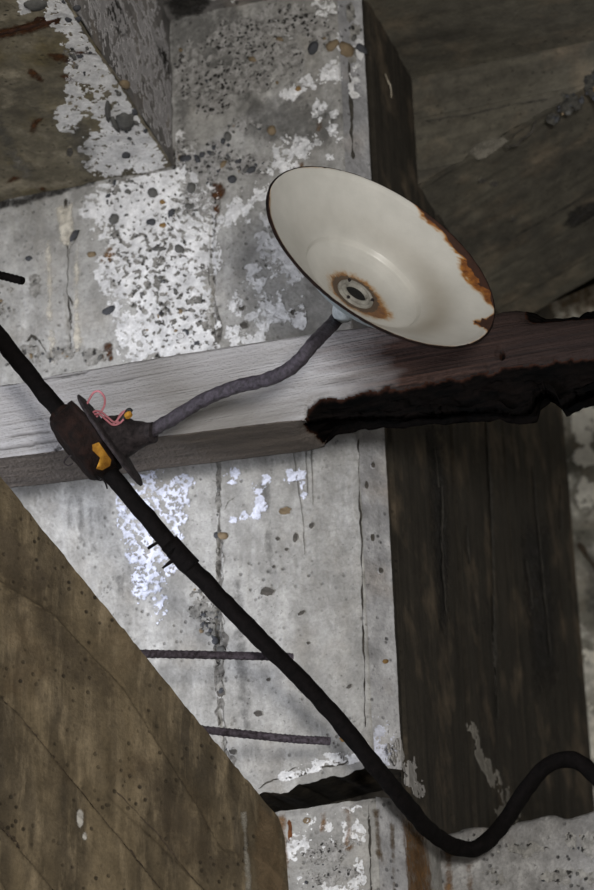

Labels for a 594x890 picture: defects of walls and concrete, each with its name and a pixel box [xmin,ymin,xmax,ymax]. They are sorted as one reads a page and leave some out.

corrosion [0,18,60,38]
peeling [17,0,367,367]
crack [207,210,223,349]
peeling [116,494,178,624]
peeling [130,469,196,540]
crack [216,462,235,587]
spalling [187,588,227,699]
crack [213,612,237,764]
peeling [278,738,360,781]
spalling [286,805,367,890]